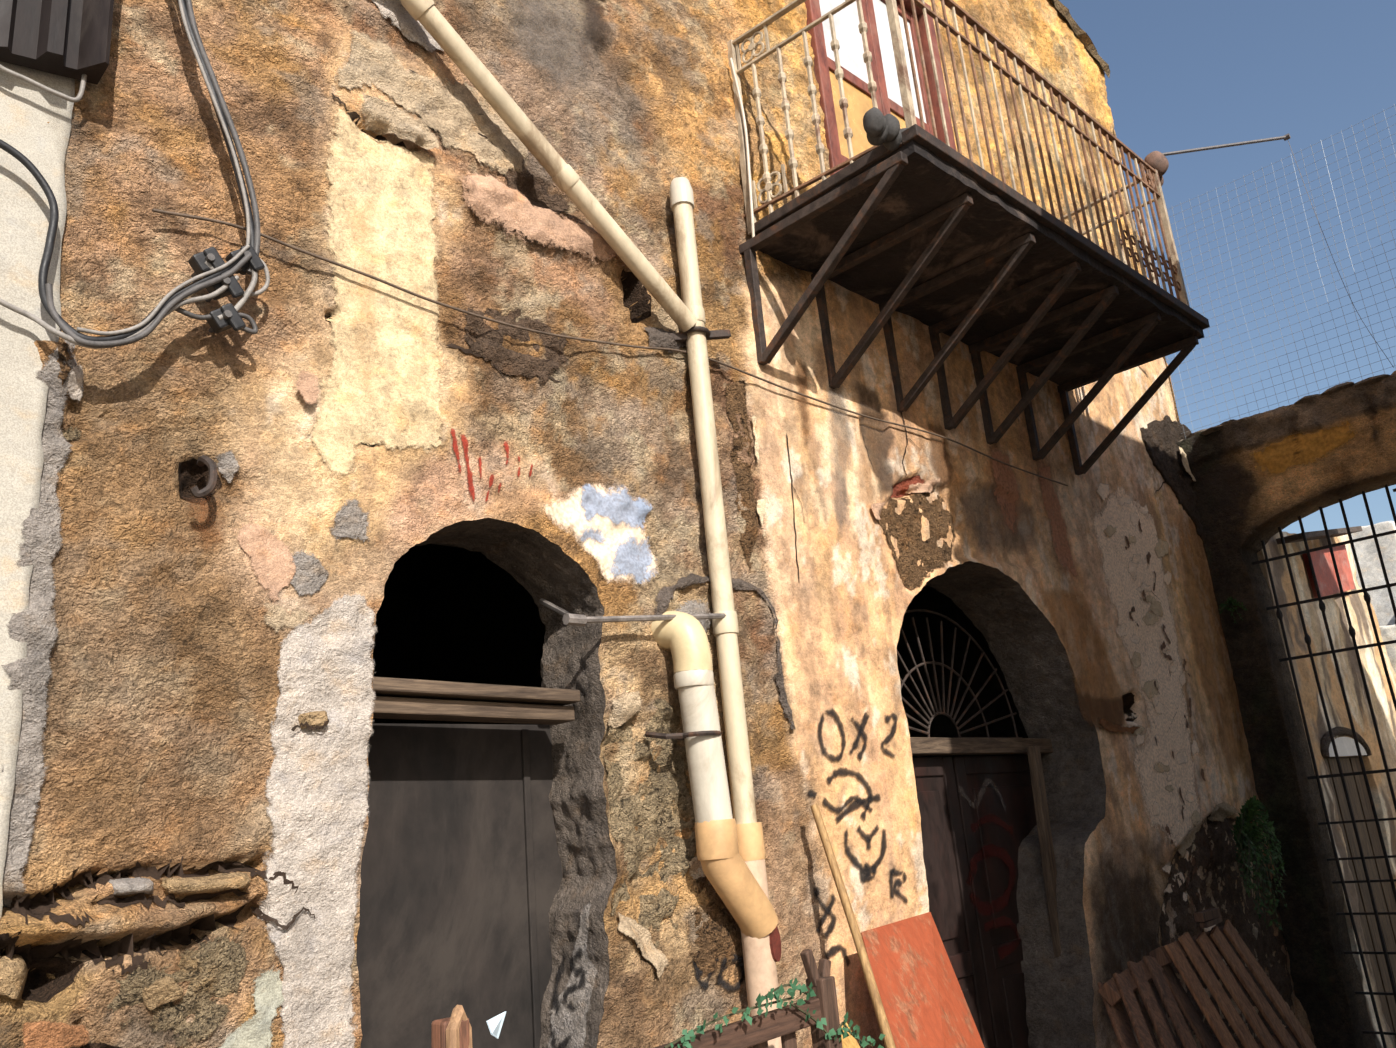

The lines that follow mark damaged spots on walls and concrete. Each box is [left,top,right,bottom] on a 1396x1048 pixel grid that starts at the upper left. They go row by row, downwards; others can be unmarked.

damp [587,0,605,45]
peeling [295,0,569,477]
peeling [546,484,656,583]
spalling [871,475,956,591]
peeling [1,340,83,908]
peeling [298,711,329,729]
peeling [1093,483,1295,1048]
crack [0,856,318,1000]